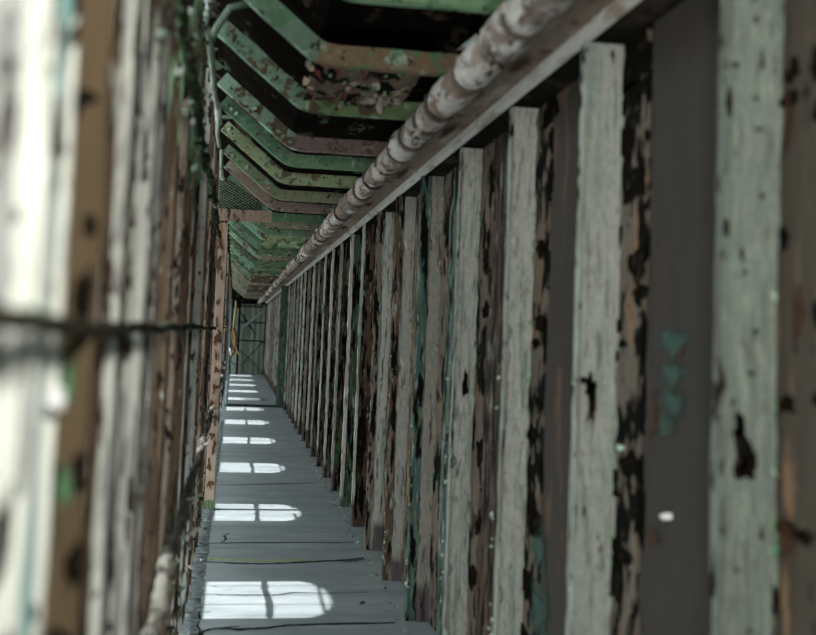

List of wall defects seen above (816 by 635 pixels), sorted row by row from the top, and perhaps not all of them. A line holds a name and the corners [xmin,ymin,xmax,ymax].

peeling [298,59,420,114]
spalling [779,56,800,109]
spalling [620,27,653,205]
spalling [779,225,789,251]
spalling [627,248,649,308]
spalling [614,301,628,362]
spalling [773,393,797,415]
spalling [612,439,638,500]
crack [200,529,365,577]
spalling [608,532,632,605]
spalling [758,517,816,555]
crack [196,594,395,635]